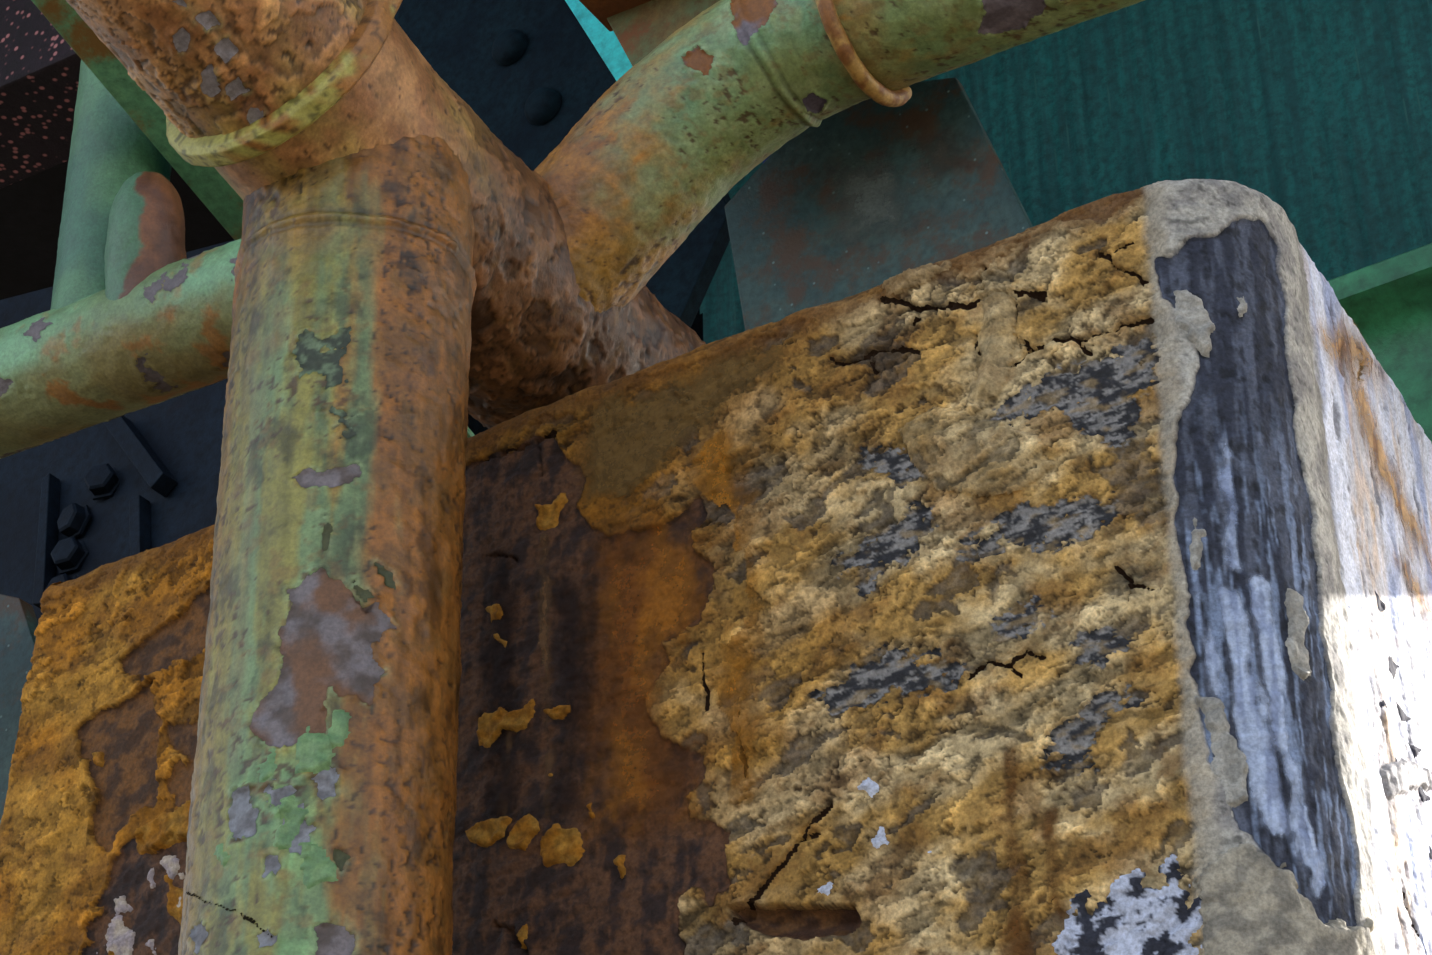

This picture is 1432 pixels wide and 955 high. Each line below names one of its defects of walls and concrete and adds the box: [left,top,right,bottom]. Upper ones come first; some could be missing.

crack [830,242,1154,375]
peeling [322,523,333,550]
spalling [78,587,210,955]
peeling [213,562,397,889]
crack [731,803,833,926]
peeling [817,882,833,896]
peeling [857,777,879,798]
peeling [871,826,889,849]
leakage [1206,446,1325,895]